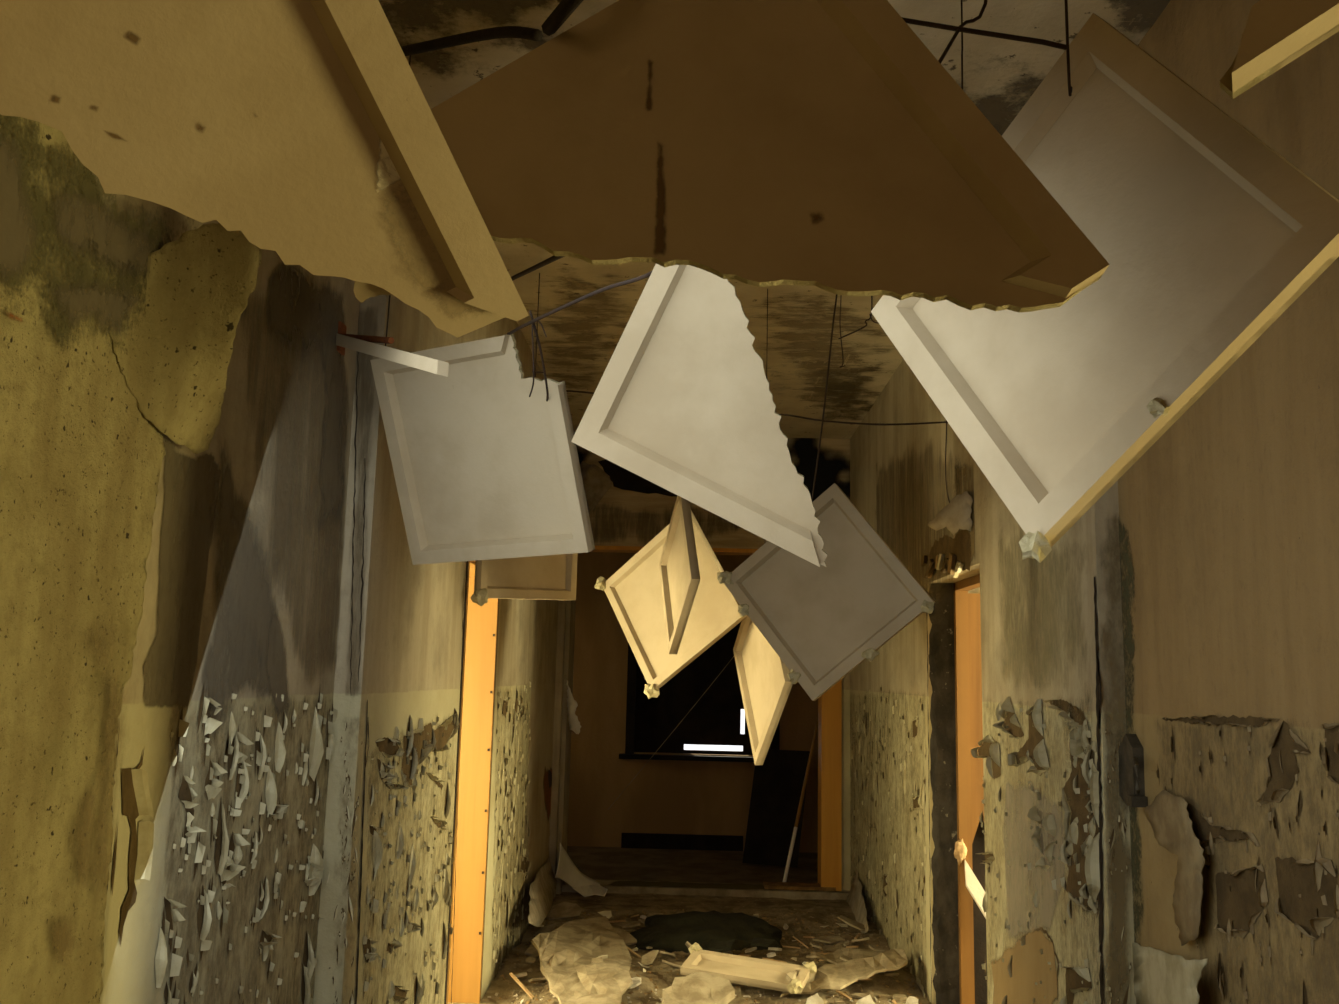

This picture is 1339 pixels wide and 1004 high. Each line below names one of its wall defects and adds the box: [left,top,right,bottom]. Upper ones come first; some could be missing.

leakage [0,114,172,348]
leakage [541,275,626,399]
leakage [757,295,888,420]
peeling [131,769,154,881]
peeling [155,686,459,1004]
peeling [492,680,557,977]
peeling [971,697,1128,980]
peeling [1033,715,1339,1004]